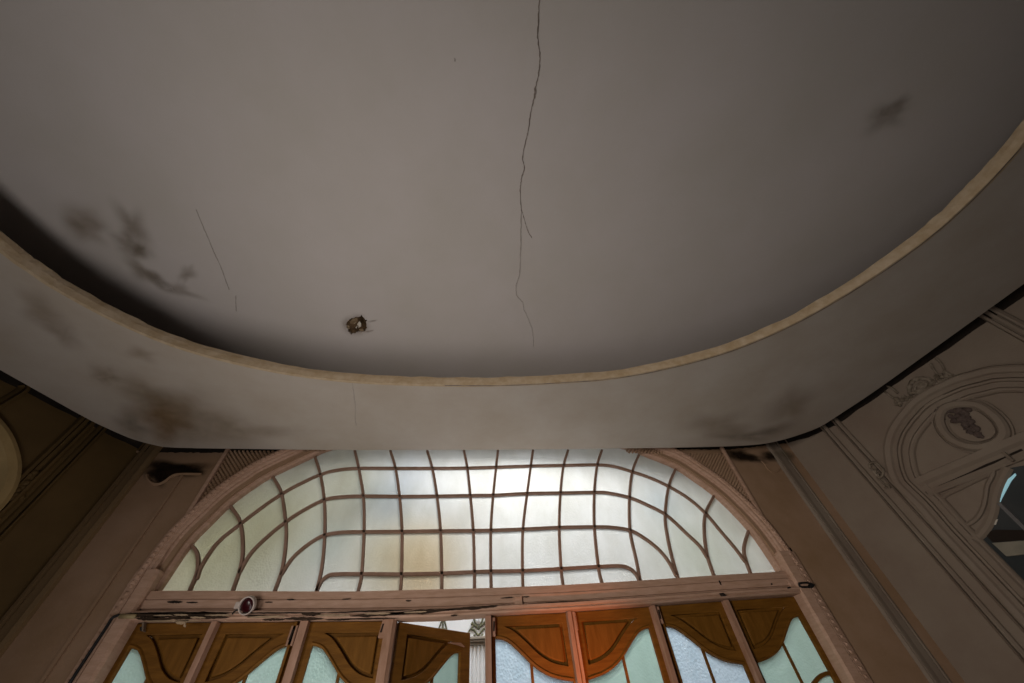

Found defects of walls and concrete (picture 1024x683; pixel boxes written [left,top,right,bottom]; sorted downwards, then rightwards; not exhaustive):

spalling [347,315,367,334]
crack [516,0,541,347]